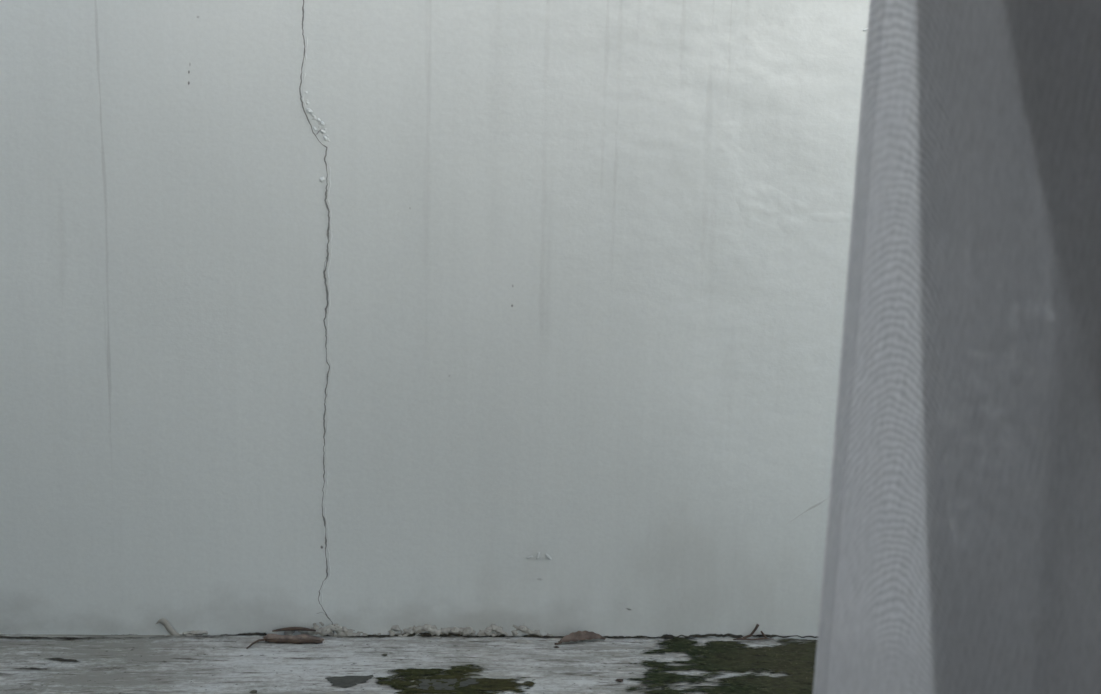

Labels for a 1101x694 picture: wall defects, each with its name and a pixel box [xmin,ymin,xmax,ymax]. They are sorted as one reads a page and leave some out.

crack [299,0,564,638]
crack [0,635,94,670]
crack [193,631,267,639]
crack [603,631,818,639]